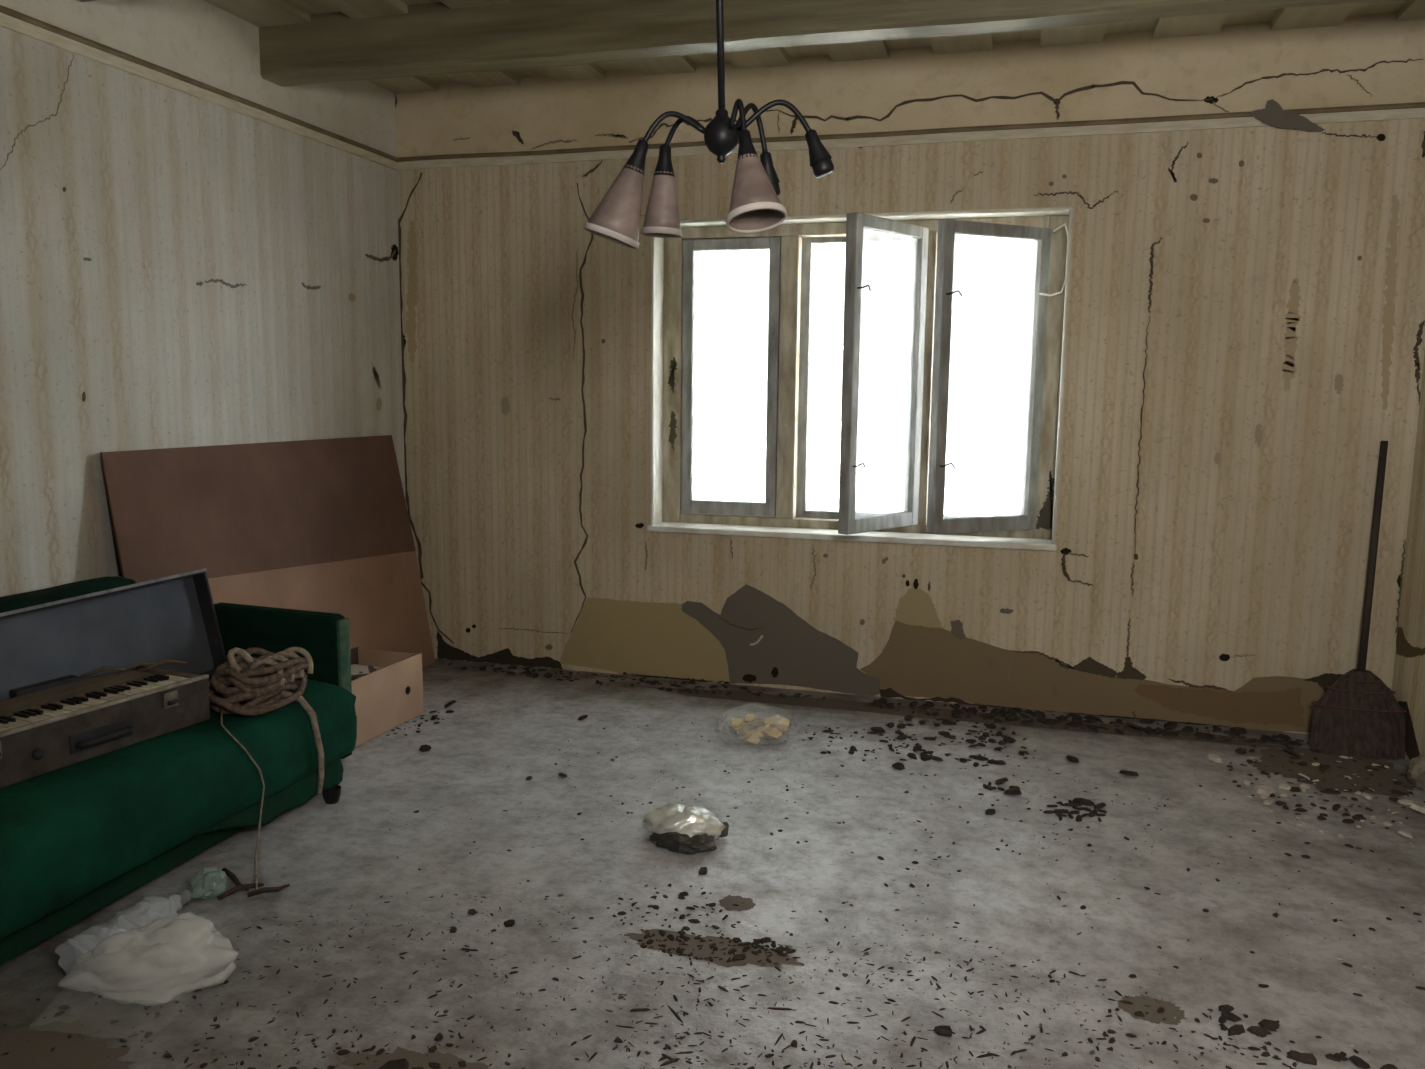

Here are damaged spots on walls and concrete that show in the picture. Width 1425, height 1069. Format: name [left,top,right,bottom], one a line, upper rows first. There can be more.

crack [0,54,74,170]
crack [398,172,454,644]
crack [498,58,1425,659]
flaking render [560,584,1343,733]